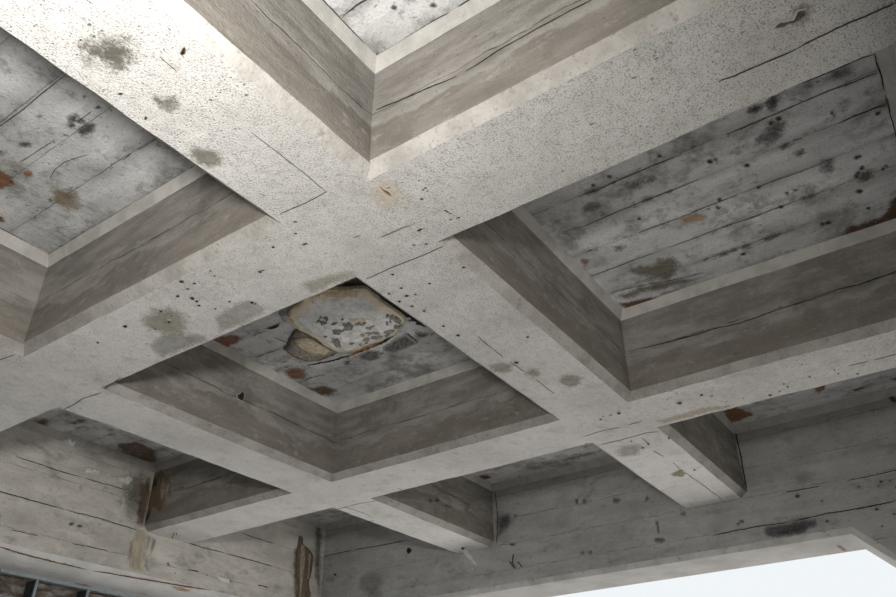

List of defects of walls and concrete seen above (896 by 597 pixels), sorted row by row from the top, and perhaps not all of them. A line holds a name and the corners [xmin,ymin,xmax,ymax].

leakage [79,39,132,70]
crack [376,0,591,110]
crack [719,2,896,82]
crack [0,76,64,126]
rust [0,170,14,189]
crack [251,132,326,214]
rust [843,198,896,235]
leakage [143,311,205,356]
rust [214,336,240,347]
leakage [217,302,262,328]
rust [724,408,753,422]
leakage [765,520,828,537]